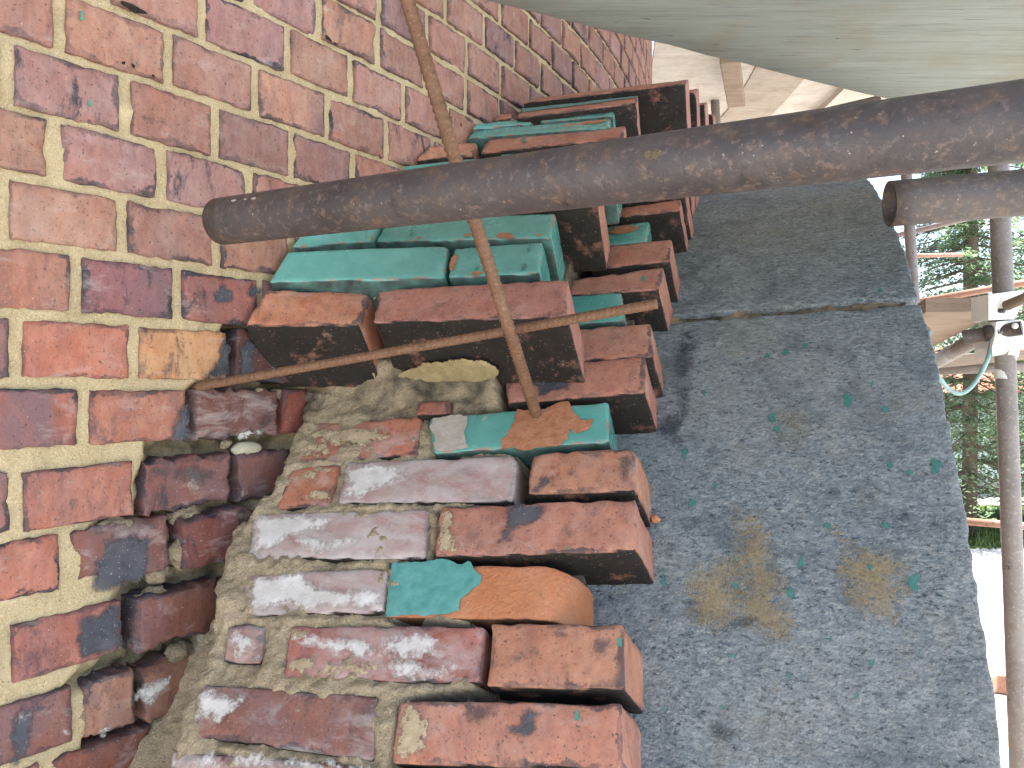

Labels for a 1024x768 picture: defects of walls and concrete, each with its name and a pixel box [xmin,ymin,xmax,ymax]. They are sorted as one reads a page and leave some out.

water stain [343,463,404,499]
water stain [249,514,358,554]
water stain [250,572,382,611]
water stain [232,631,252,656]
water stain [294,633,455,677]
water stain [195,690,243,722]
water stain [235,752,272,766]